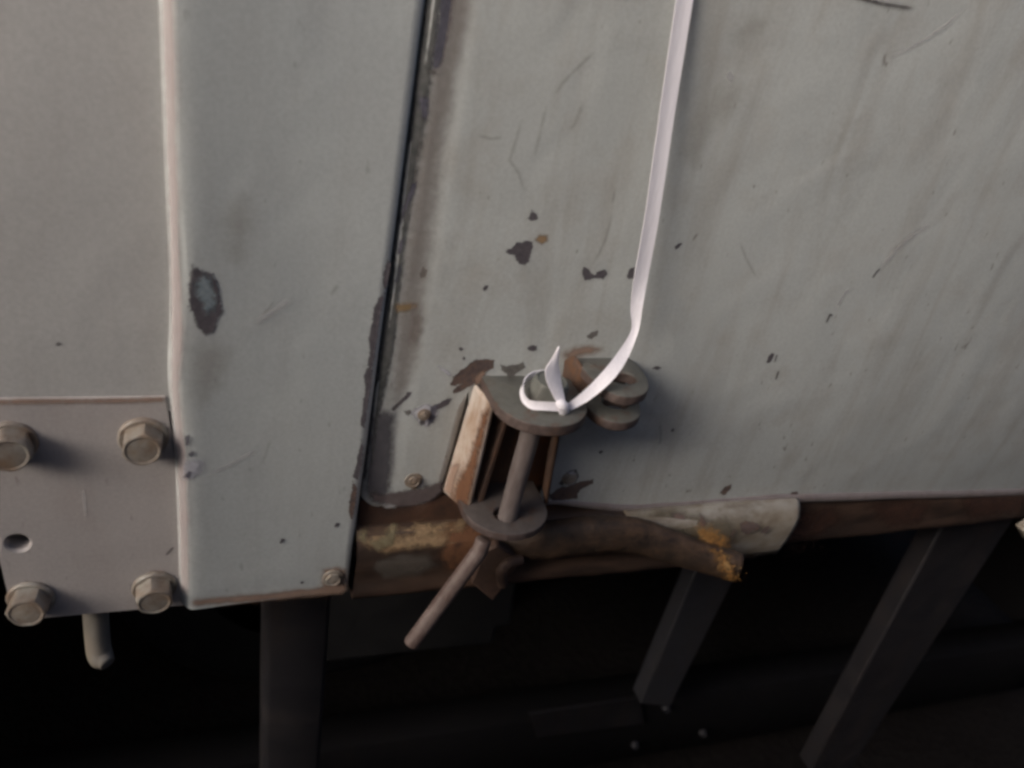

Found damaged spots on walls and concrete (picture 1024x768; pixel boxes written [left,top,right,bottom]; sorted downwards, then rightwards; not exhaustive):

peeling [165,0,224,589]
peeling [506,241,533,265]
peeling [582,267,607,280]
peeling [349,239,404,519]
peeling [391,359,525,426]
rust [359,521,482,570]